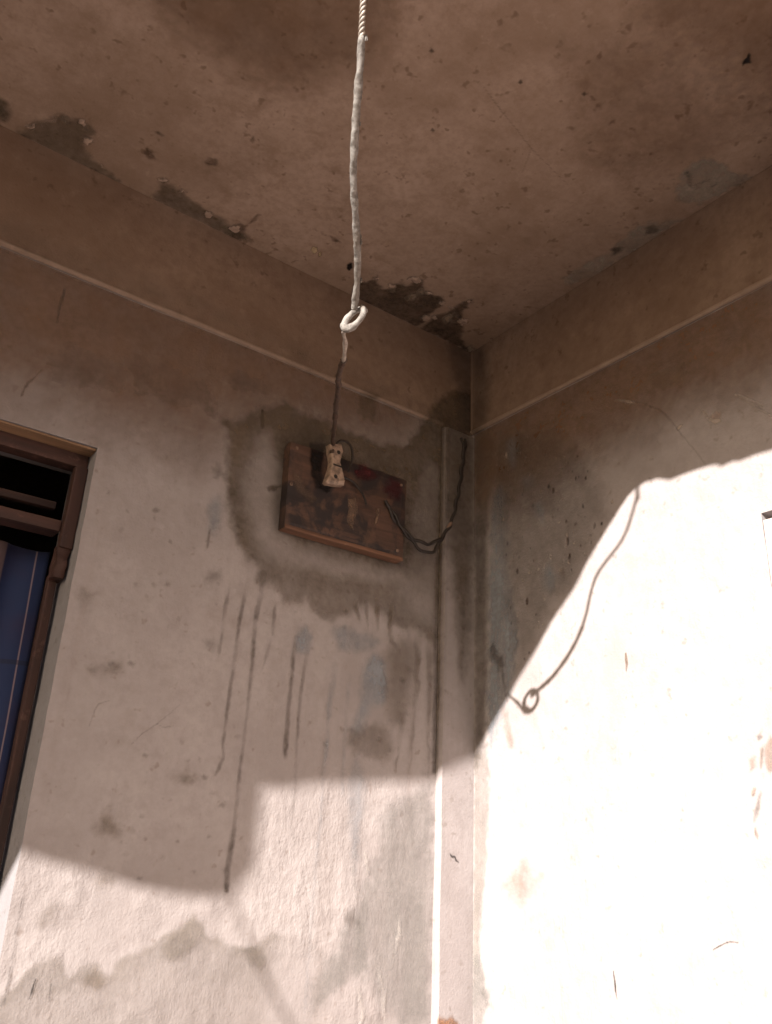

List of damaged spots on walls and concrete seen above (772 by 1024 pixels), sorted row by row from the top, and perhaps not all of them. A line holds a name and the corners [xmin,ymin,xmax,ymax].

flaking render [359,277,474,352]
leakage [224,392,487,636]